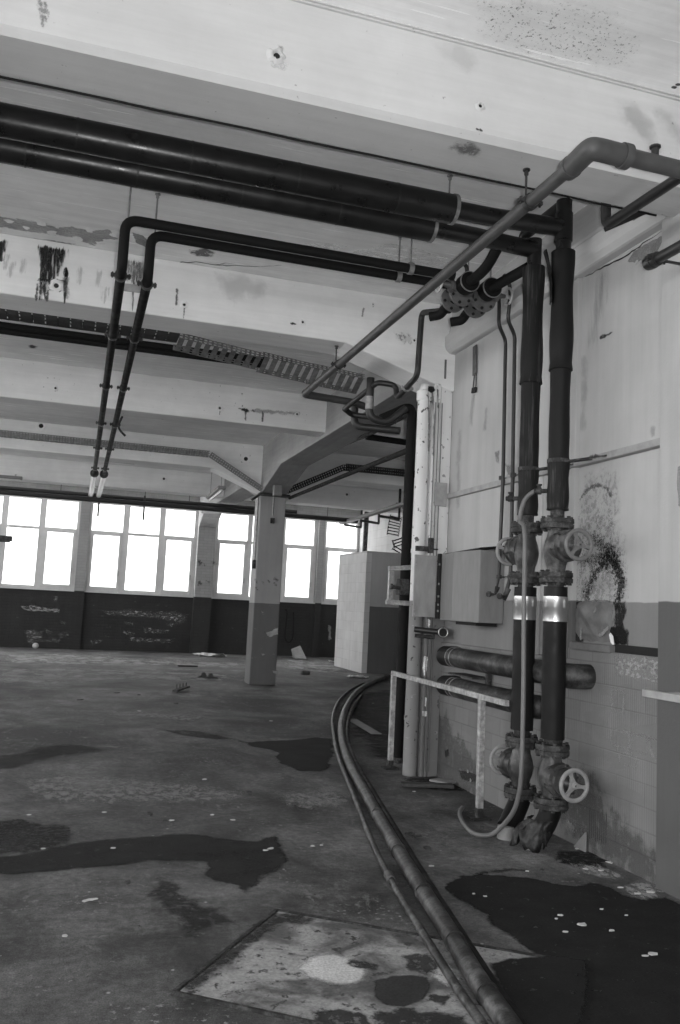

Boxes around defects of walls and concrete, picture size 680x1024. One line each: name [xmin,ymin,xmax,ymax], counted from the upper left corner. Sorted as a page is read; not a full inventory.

water stain [484,2,635,62]
peeling [0,217,118,246]
peeling [133,233,147,246]
water stain [38,245,65,292]
water stain [576,531,629,645]
water stain [0,745,97,769]
water stain [168,730,334,771]
water stain [0,819,286,890]
water stain [445,869,680,1024]